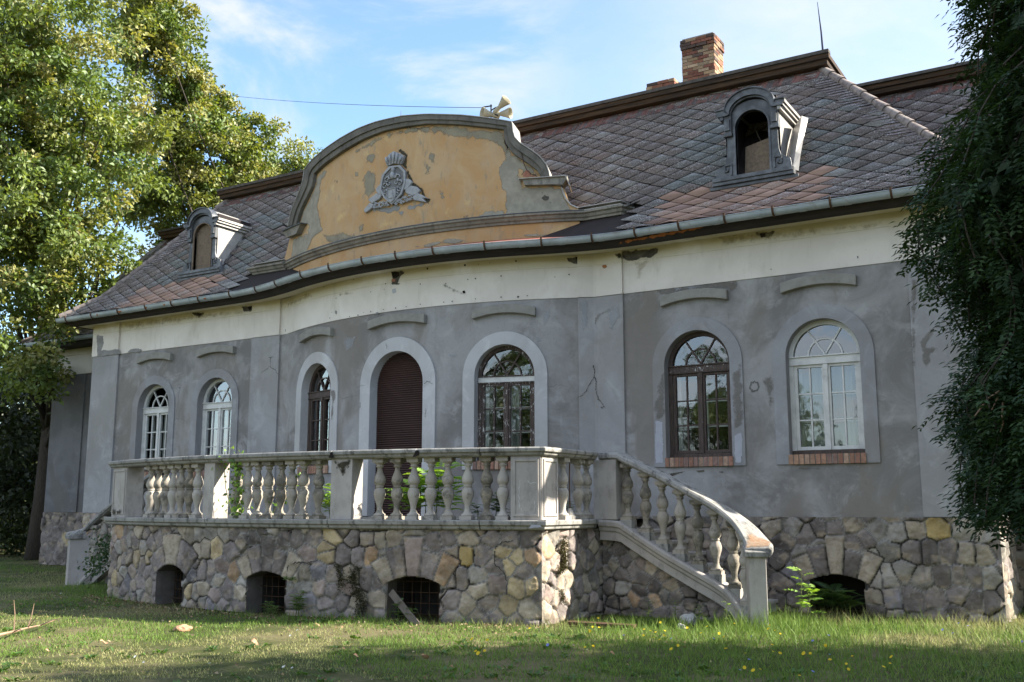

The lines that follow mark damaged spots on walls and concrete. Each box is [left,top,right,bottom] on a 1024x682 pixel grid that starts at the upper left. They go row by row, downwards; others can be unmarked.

peeling [291,171,363,257]
peeling [355,126,570,216]